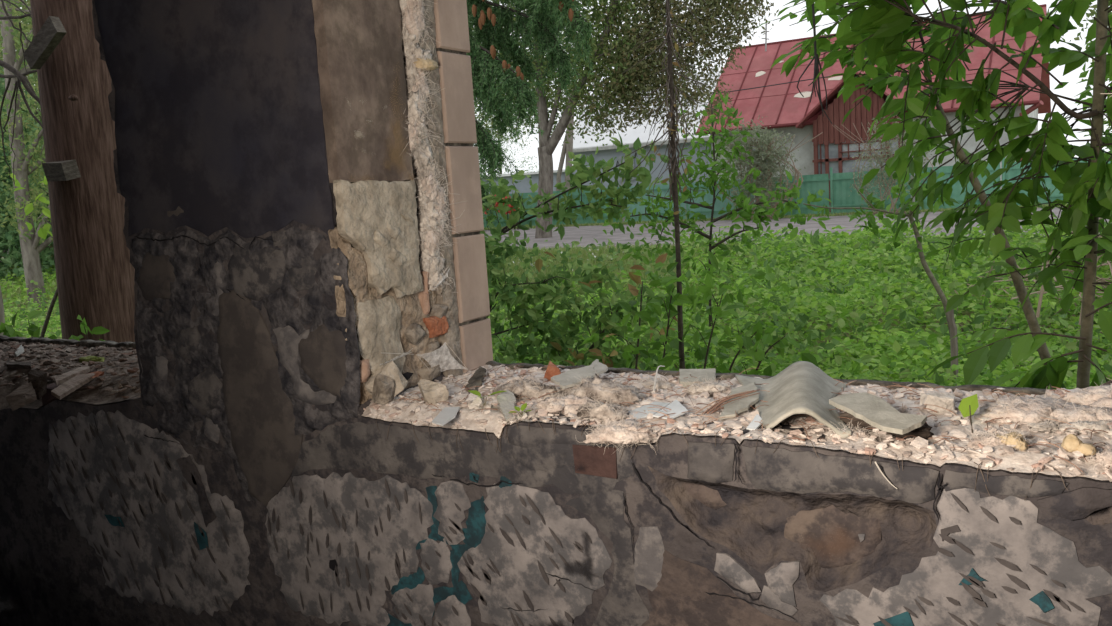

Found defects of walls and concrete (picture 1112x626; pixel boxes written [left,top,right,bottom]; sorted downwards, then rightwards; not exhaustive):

flaking render [94,0,453,501]
peeling [391,496,486,618]
peeling [387,614,412,626]